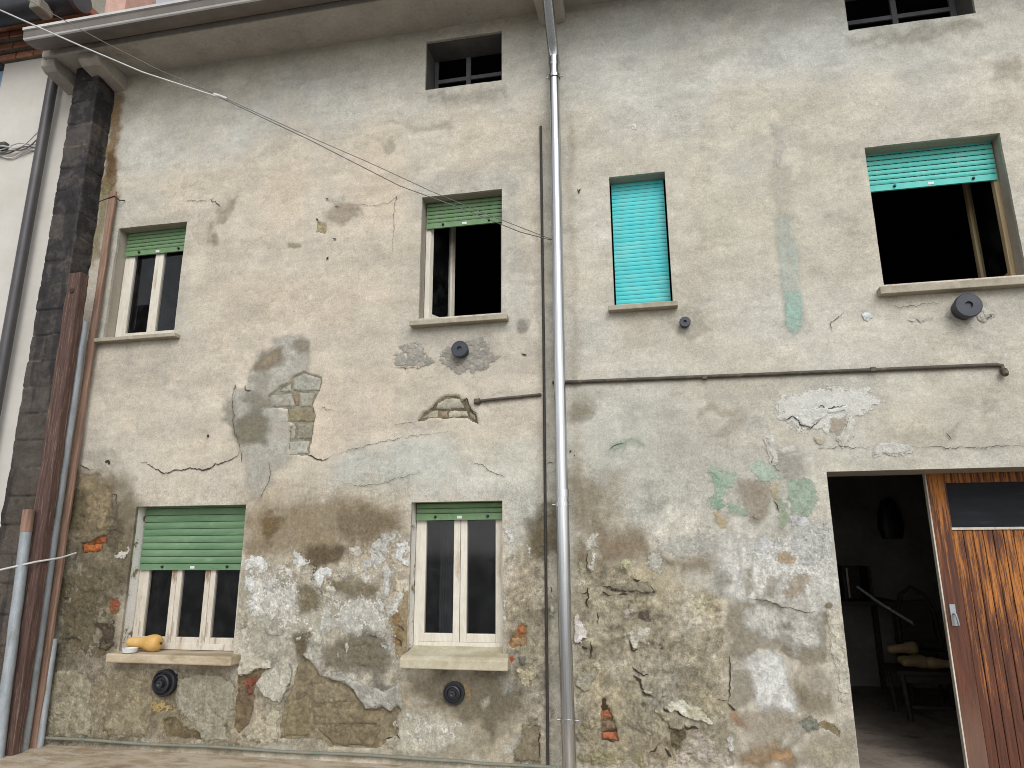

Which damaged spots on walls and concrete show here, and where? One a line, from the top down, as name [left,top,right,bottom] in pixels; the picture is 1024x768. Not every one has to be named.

rust [93,94,123,256]
damp [69,465,122,547]
crack [143,386,251,474]
flaking render [269,372,322,456]
flaking render [397,396,478,425]
peeling [749,384,882,599]
crack [912,434,1021,449]
damp [239,499,402,674]
flaking render [234,529,410,751]
flaking render [603,559,661,673]
peeling [823,602,851,706]
flaking render [578,691,737,768]